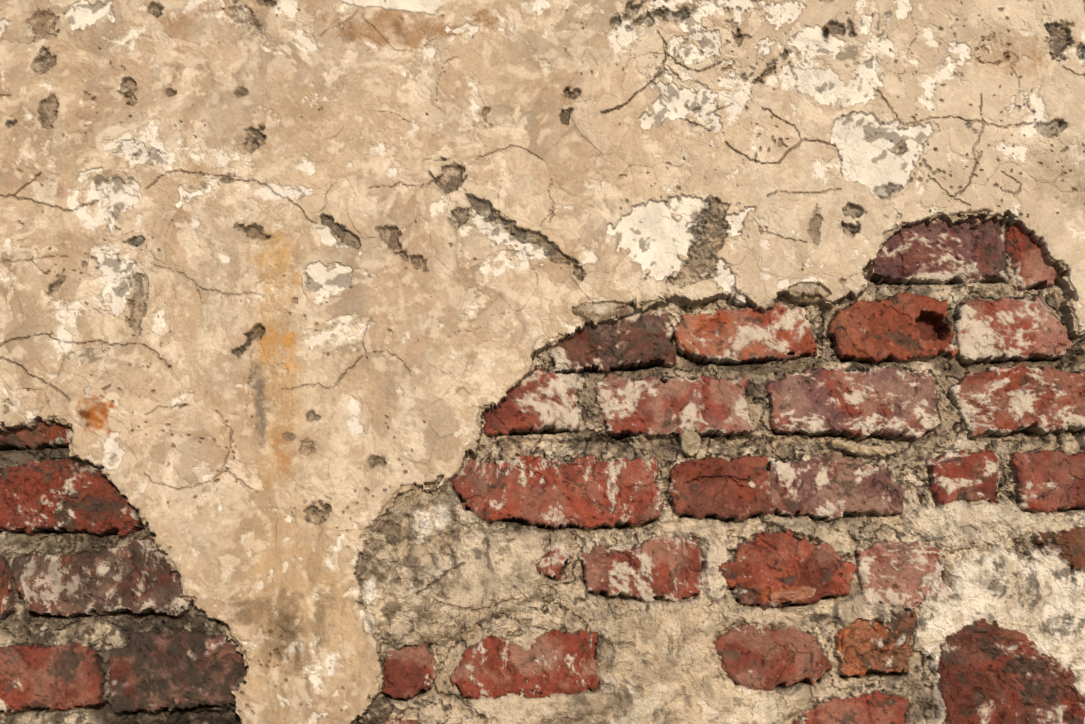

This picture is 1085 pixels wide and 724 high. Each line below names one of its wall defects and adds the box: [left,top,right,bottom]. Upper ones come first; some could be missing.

crack [600,37,721,114]
peeling [610,0,745,133]
crack [145,169,302,209]
spalling [429,161,587,282]
peeling [607,195,790,316]
crack [679,106,844,195]
peeling [749,0,1085,344]
crack [873,87,1034,199]
crack [0,333,174,403]
spalling [361,317,618,646]
spalling [0,412,248,724]
water stain [913,538,1085,724]